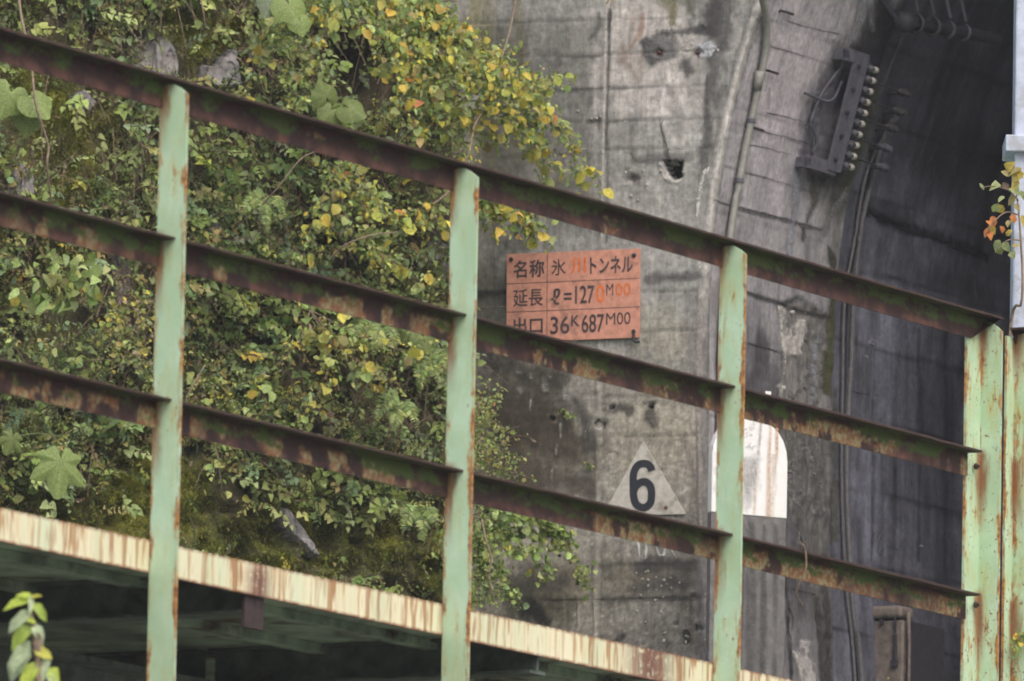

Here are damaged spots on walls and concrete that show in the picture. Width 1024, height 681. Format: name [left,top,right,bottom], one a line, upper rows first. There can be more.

spalling [659,160,684,183]
damp [787,0,903,269]